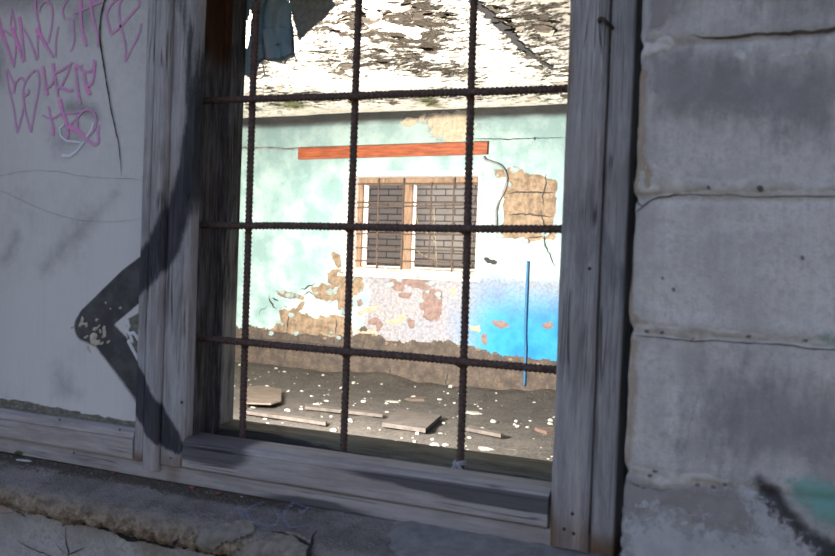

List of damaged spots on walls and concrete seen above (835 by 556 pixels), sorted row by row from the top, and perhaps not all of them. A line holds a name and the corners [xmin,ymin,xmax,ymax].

water stain [243,98,567,125]
peeling [494,167,559,244]
peeling [235,252,557,391]
water stain [623,483,757,533]
crack [19,514,231,556]